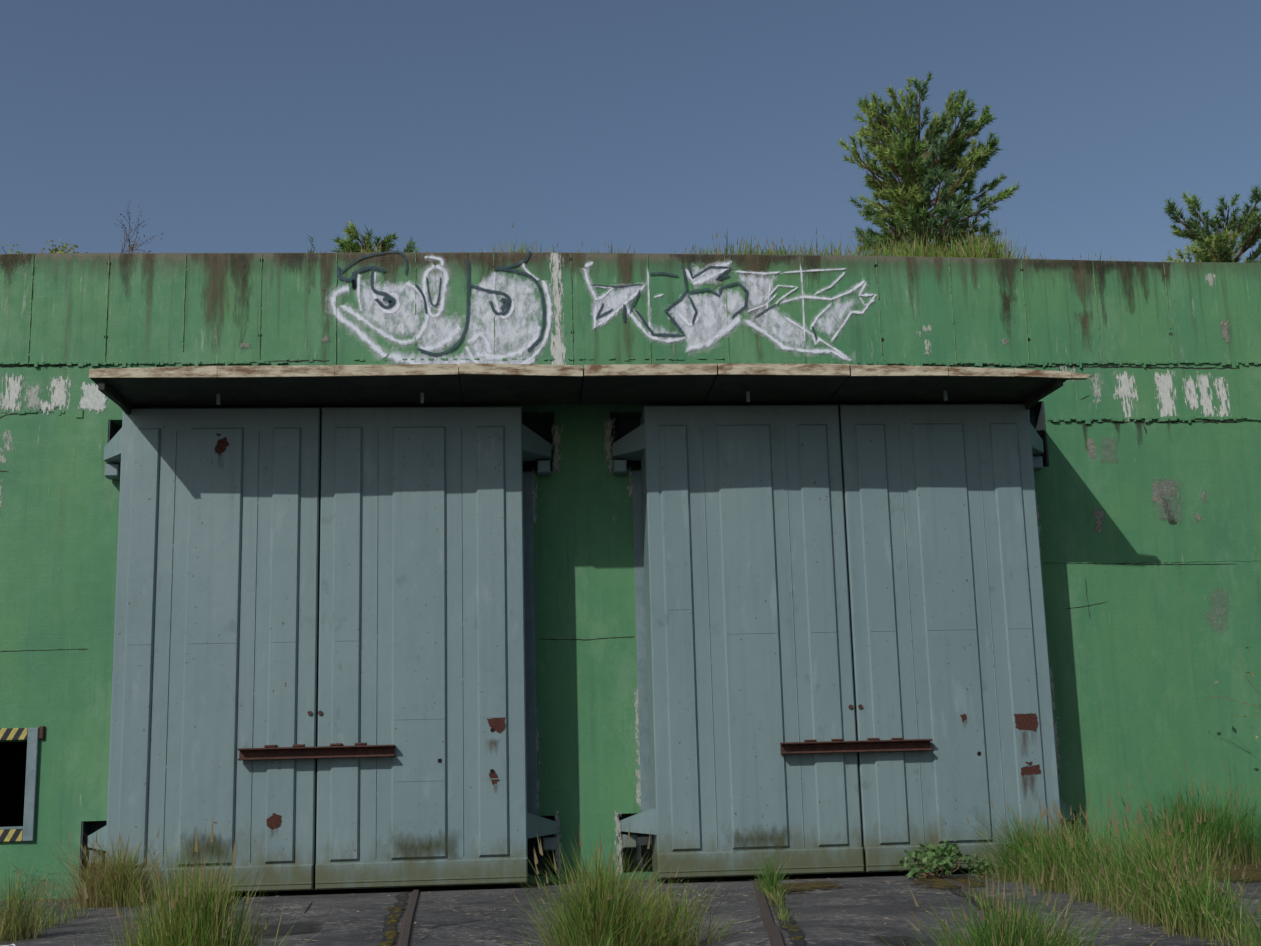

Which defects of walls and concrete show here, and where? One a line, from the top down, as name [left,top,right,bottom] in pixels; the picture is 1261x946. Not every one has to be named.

damp [278,253,315,265]
damp [231,253,249,298]
damp [1034,260,1169,305]
crack [0,361,143,369]
crack [245,357,329,365]
peeling [0,373,108,415]
peeling [1090,371,1138,422]
peeling [1154,370,1230,417]
rust [487,717,506,745]
rust [1014,713,1039,741]
rust [1021,762,1041,791]
rust [266,813,282,830]